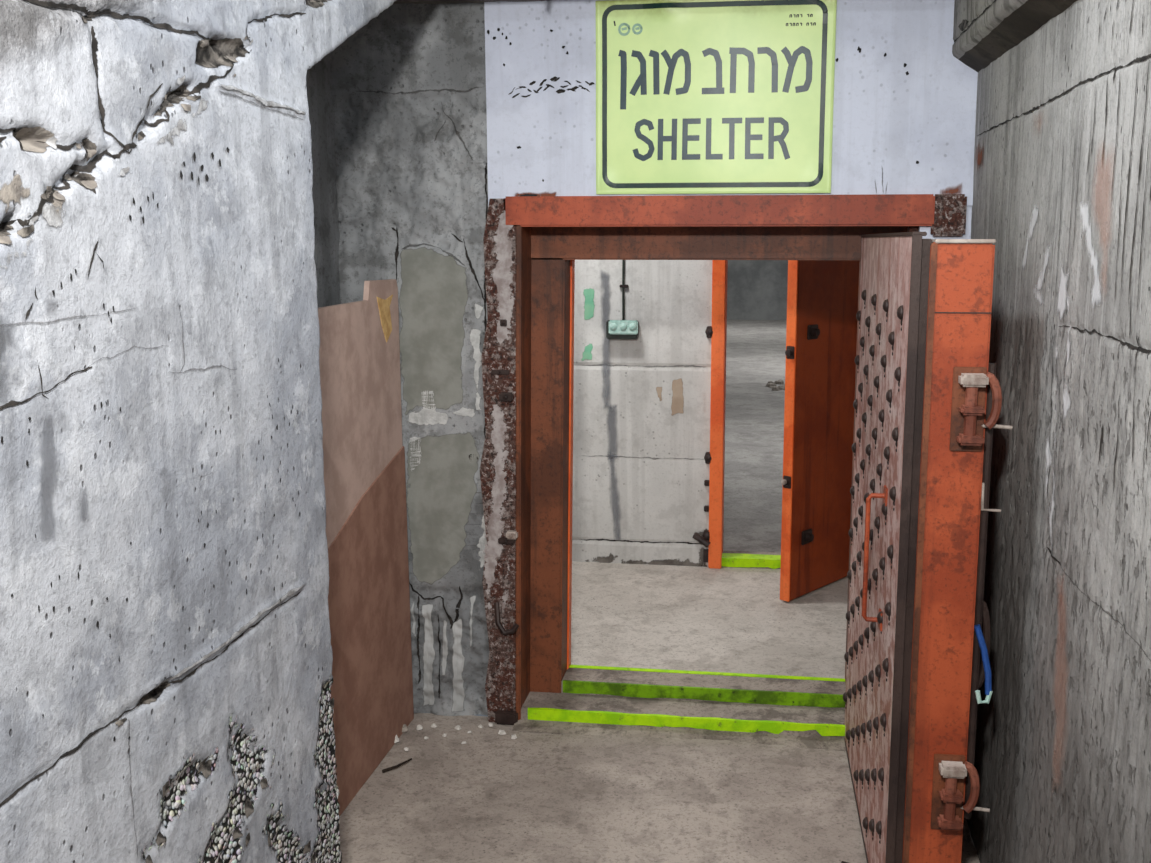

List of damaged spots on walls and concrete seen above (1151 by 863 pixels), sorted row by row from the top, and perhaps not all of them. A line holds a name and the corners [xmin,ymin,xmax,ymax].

crack [0,0,306,237]
crack [978,54,1151,136]
crack [88,240,104,277]
damp [1022,207,1038,269]
damp [1034,0,1151,544]
crack [1059,299,1151,369]
crack [0,361,92,410]
damp [410,595,476,712]
crack [0,584,304,807]